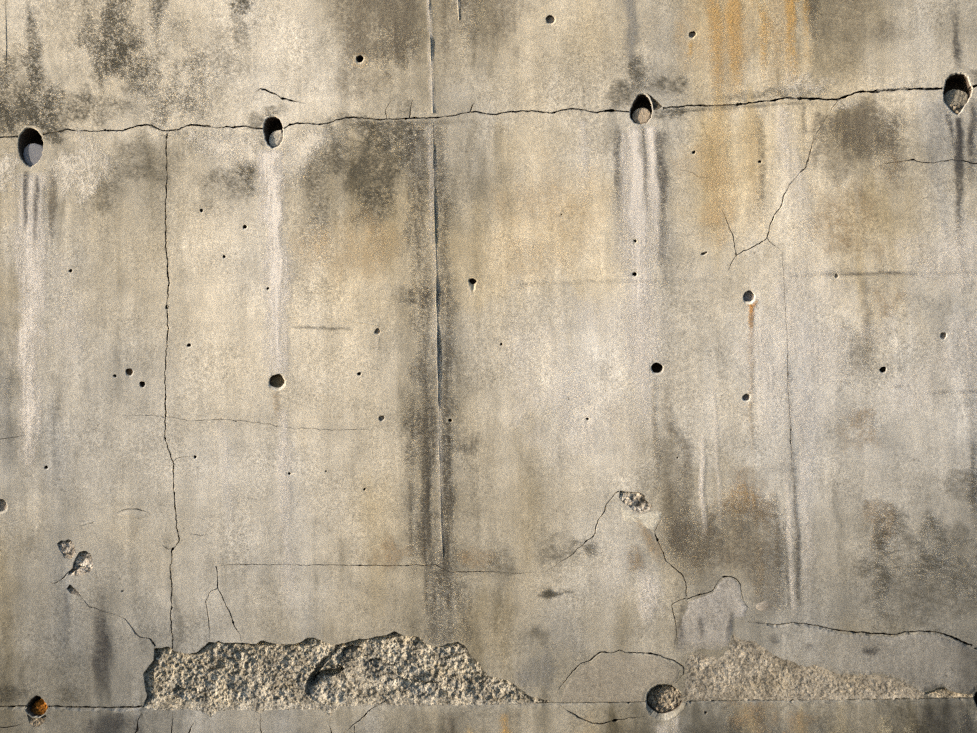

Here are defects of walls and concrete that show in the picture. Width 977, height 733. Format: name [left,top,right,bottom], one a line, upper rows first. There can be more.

damp [0,12,117,458]
damp [77,0,160,91]
crack [43,88,630,649]
crack [329,700,385,733]
damp [407,342,473,625]
spalling [143,578,977,717]
damp [615,108,707,425]
crack [556,516,972,725]
crack [663,87,942,463]
crack [871,159,977,167]